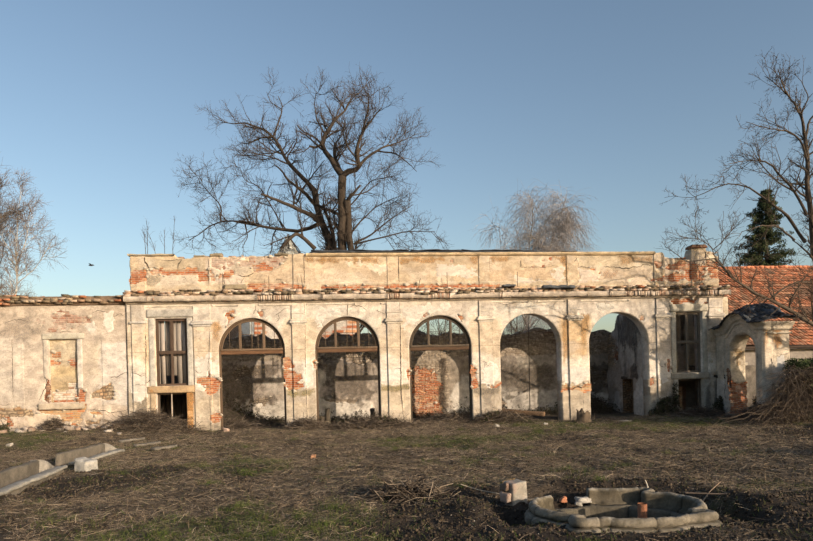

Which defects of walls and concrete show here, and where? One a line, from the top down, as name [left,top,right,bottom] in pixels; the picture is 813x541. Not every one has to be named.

flaking render [129,254,288,284]
flaking render [247,282,306,290]
flaking render [651,259,718,286]
flaking render [36,310,115,334]
flaking render [0,377,117,426]
flaking render [50,350,77,368]
peeling [193,352,223,395]
flaking render [281,357,318,393]
peeling [561,366,607,393]
flaking render [725,366,748,416]